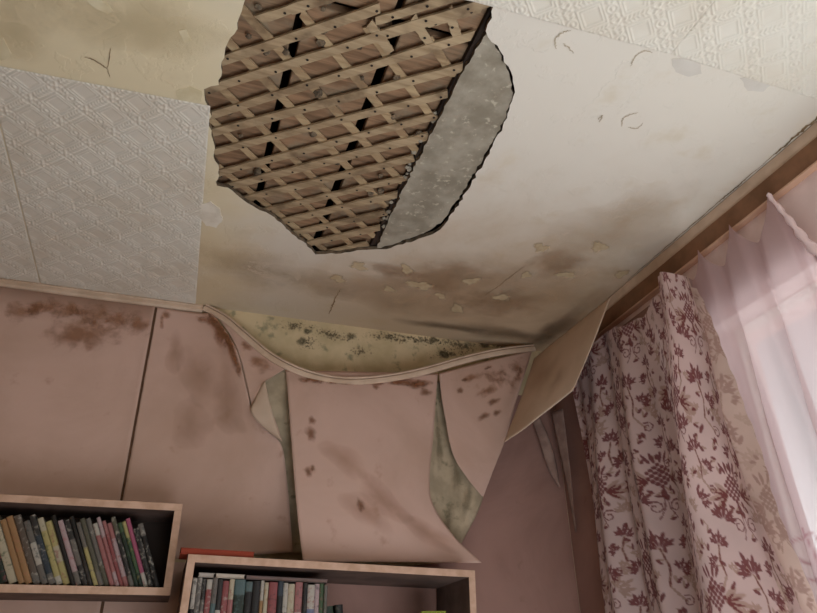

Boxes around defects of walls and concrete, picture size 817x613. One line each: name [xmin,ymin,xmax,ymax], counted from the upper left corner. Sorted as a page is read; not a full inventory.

damp [288,322,372,354]
damp [374,333,506,358]
peeling [533,409,577,532]